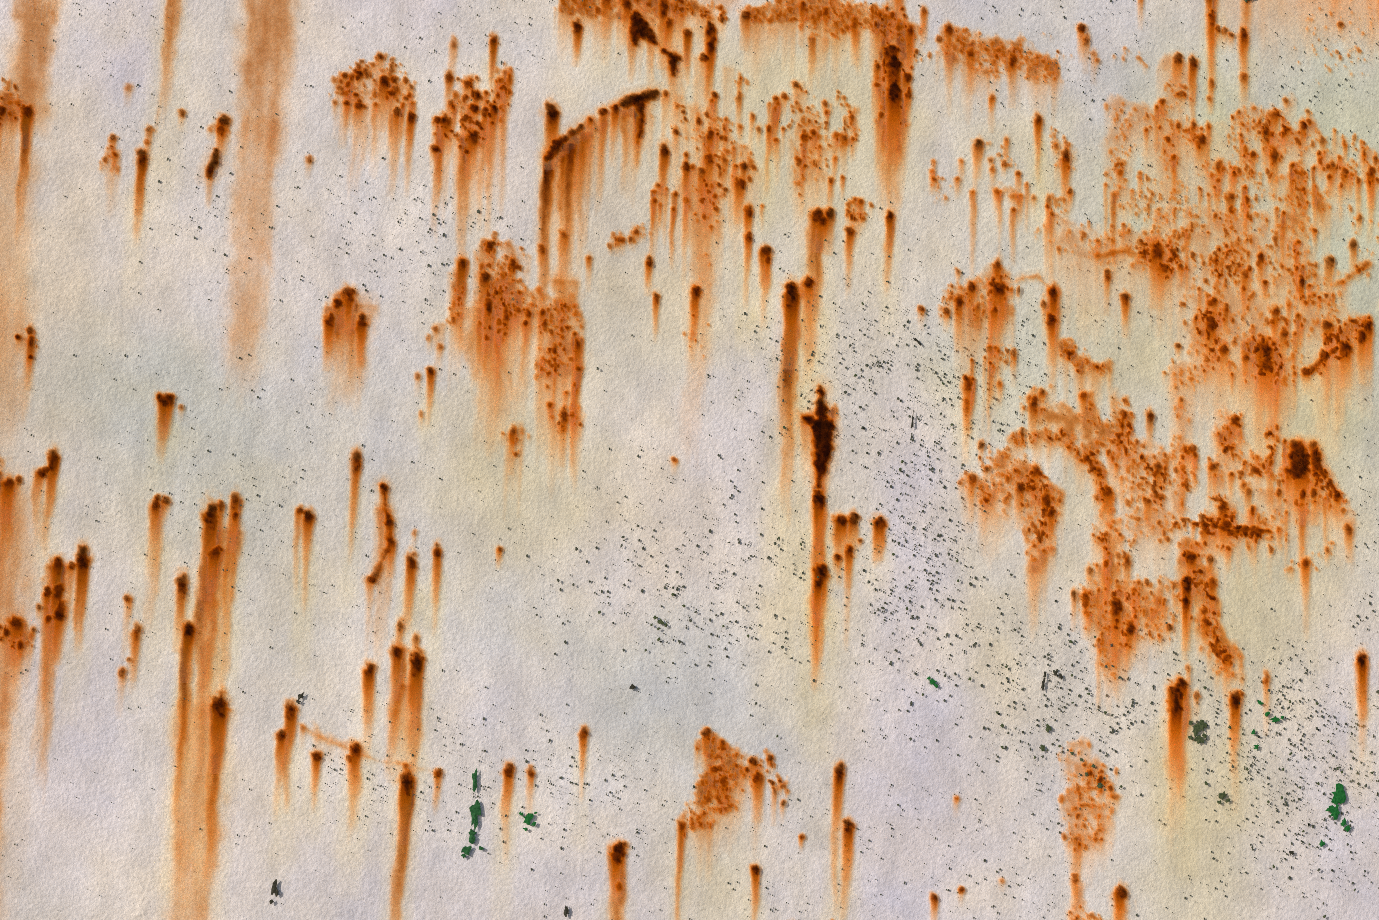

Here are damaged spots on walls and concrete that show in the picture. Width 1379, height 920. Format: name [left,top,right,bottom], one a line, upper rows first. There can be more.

rust [0,544,92,654]
rust [174,492,242,811]
rust [329,52,416,136]
rust [430,33,512,186]
rust [426,231,583,433]
rust [677,727,789,882]
rust [607,73,860,281]
rust [559,0,1059,158]
rust [781,197,894,640]
rust [917,51,1379,418]
rust [957,282,1352,733]
rust [1166,665,1200,771]